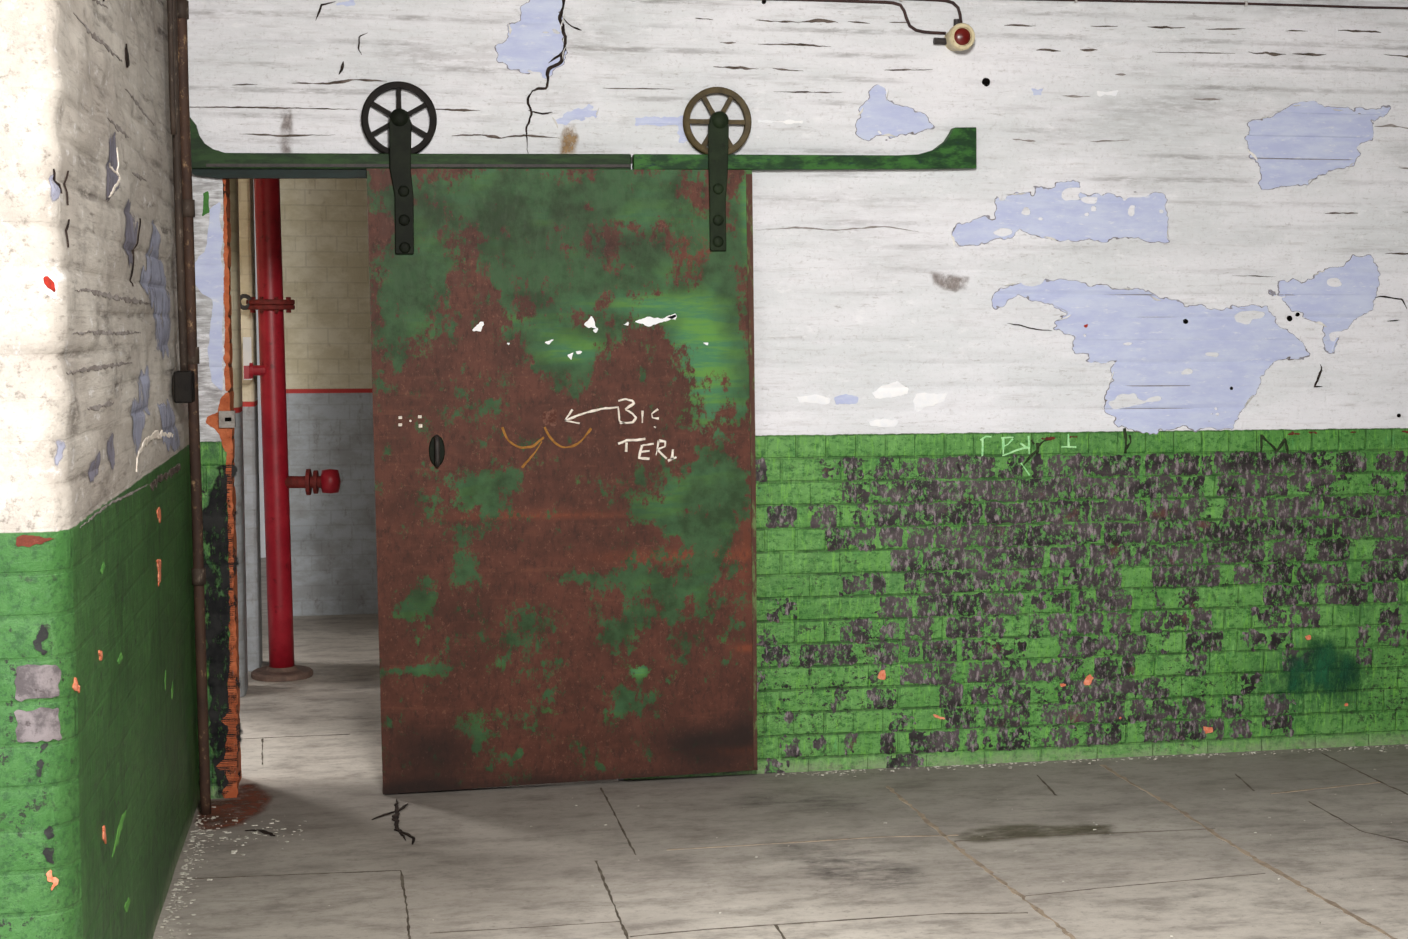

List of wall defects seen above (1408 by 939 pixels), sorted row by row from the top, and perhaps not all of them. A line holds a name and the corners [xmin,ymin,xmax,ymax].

crack [435,0,582,152]
peeling [494,0,568,79]
crack [606,84,660,92]
crack [696,18,907,93]
crack [889,66,933,74]
peeling [1244,101,1391,190]
peeling [951,180,1170,246]
peeling [991,254,1380,435]
rust [206,392,233,453]
spalling [216,453,239,798]
peeling [756,450,1408,774]
water stain [1287,642,1357,693]